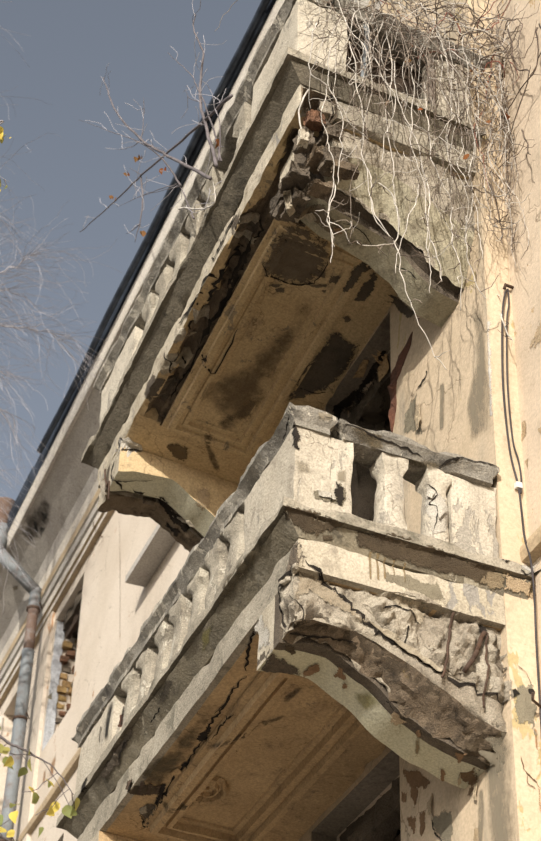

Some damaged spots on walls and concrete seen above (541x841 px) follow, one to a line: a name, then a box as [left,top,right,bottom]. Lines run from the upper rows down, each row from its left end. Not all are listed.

spalling [261,190,378,302]
water stain [217,333,291,428]
spalling [289,332,424,434]
water stain [468,315,492,435]
water stain [24,502,49,540]
crack [104,463,152,500]
water stain [167,443,188,462]
peeling [283,505,345,541]
crack [325,416,422,457]
crack [439,457,496,467]
spalling [277,531,537,735]
crack [156,676,247,810]